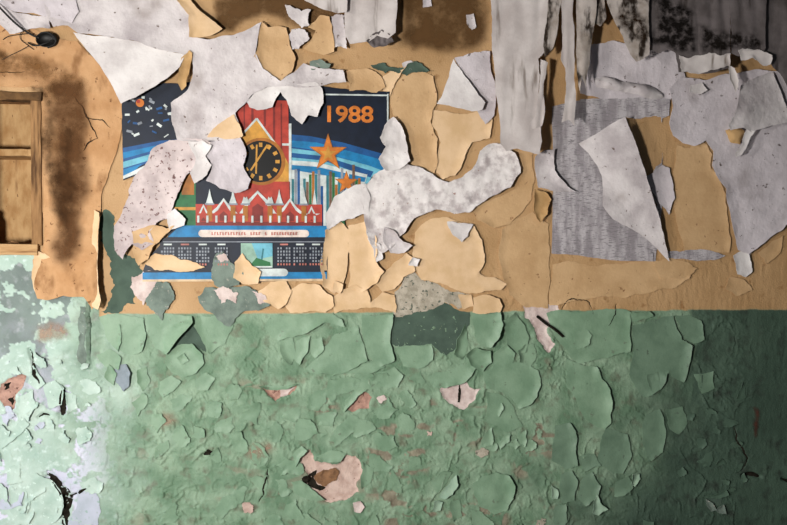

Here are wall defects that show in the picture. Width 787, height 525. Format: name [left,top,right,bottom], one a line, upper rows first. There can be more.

peeling [254,21,296,81]
peeling [346,66,493,180]
leakage [0,53,87,260]
peeling [673,142,731,253]
peeling [130,253,204,305]
crack [30,349,40,383]
crack [39,388,68,417]
peeling [0,313,234,462]
peeling [155,151,715,525]
crack [734,428,759,477]
peeling [0,464,66,525]
crack [47,473,86,525]